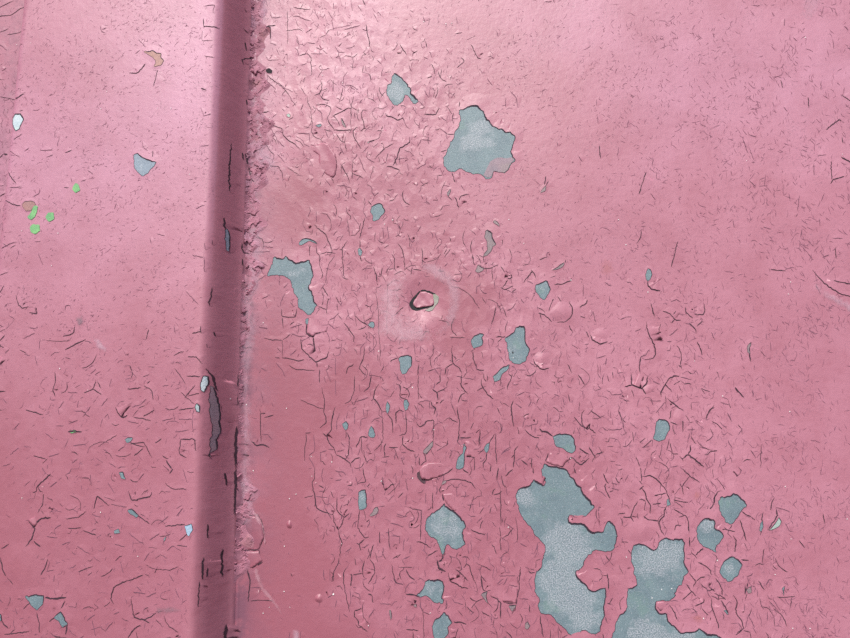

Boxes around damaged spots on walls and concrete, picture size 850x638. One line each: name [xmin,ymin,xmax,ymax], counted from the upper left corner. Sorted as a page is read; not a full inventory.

peeling [382,64,428,111]
peeling [128,148,162,180]
peeling [437,93,524,183]
crack [0,0,276,638]
peeling [262,231,329,336]
peeling [466,325,489,352]
peeling [488,313,539,385]
crack [223,0,850,638]
spalling [192,372,233,457]
peeling [412,438,474,638]
peeling [502,423,754,638]